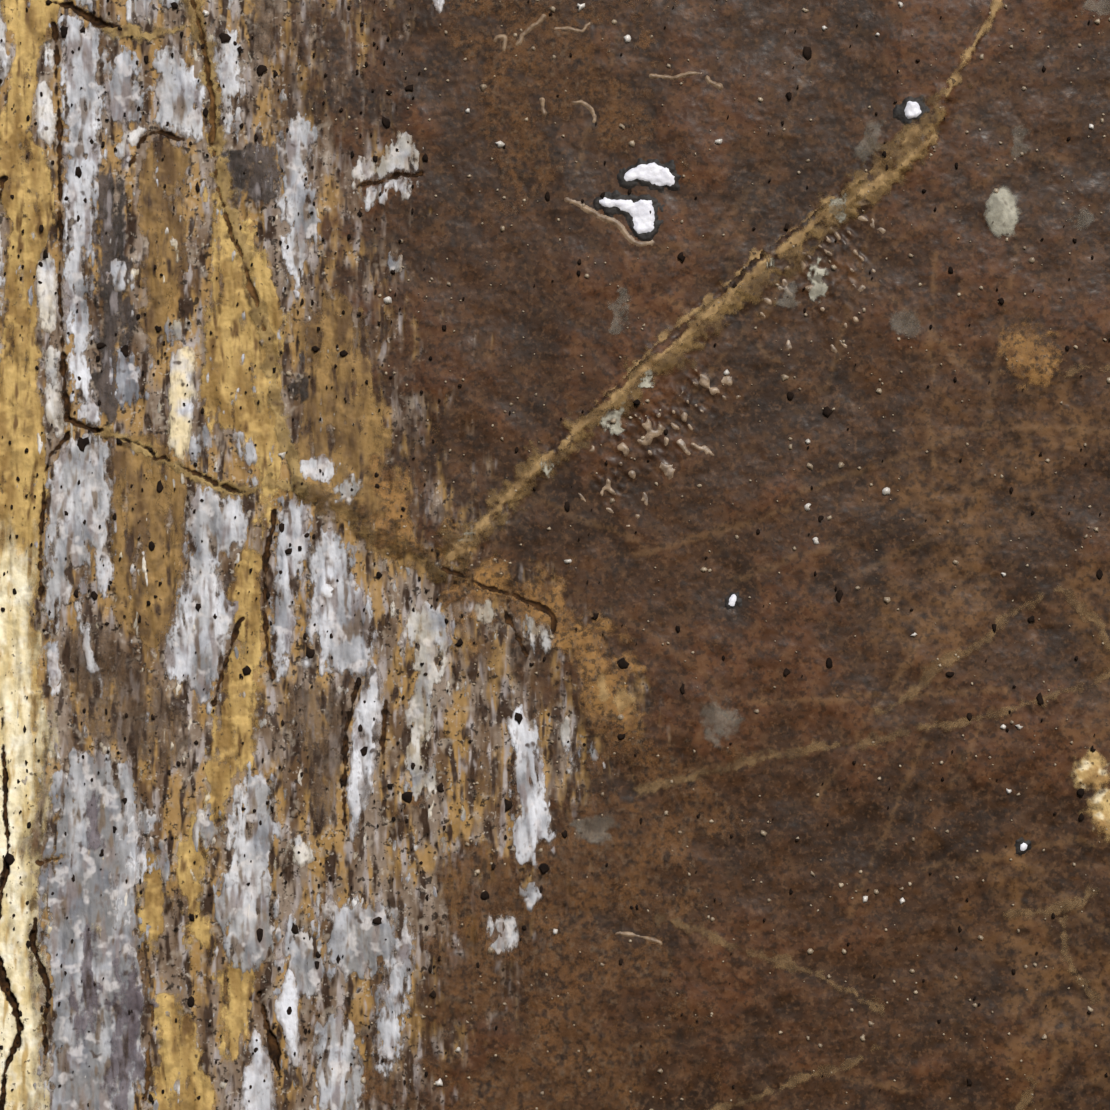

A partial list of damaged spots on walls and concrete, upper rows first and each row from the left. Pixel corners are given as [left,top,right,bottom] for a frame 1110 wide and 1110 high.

peeling [351,132,428,230]
peeling [387,240,403,274]
rust [449,0,656,215]
crack [211,509,277,706]
crack [441,567,557,657]
crack [0,917,52,1110]
crack [0,718,59,919]
peeling [12,737,174,1110]
rust [350,1059,395,1109]
peeling [487,704,615,955]
rust [418,721,749,1110]